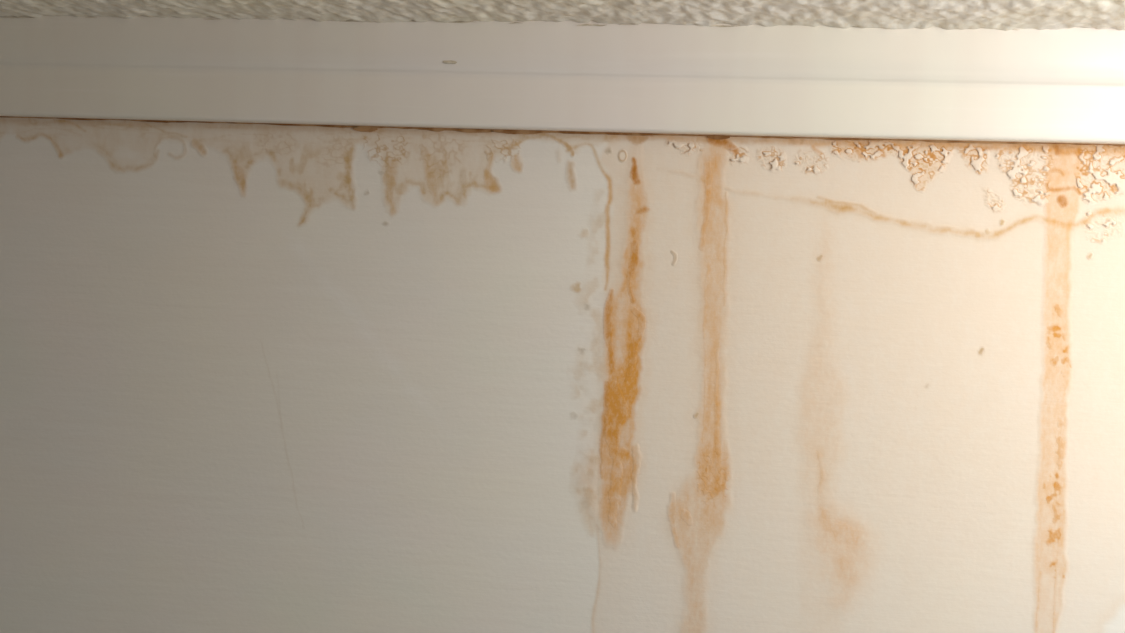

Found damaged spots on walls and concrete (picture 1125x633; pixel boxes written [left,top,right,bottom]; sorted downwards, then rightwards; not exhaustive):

leakage [0,117,699,633]
leakage [711,145,1046,633]
leakage [1059,196,1125,633]